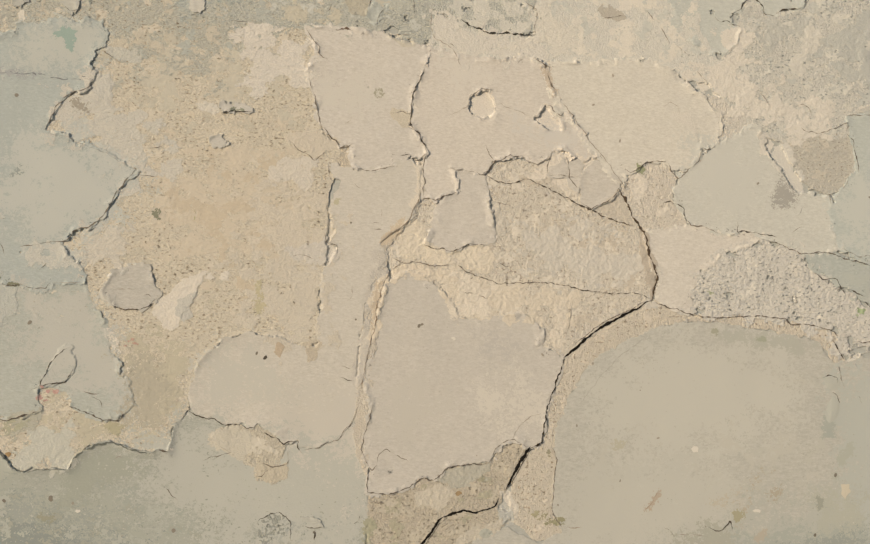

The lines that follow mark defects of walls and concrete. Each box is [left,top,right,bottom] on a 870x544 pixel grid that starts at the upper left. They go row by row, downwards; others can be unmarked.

crack [309,79,350,148]
peeling [0,0,733,473]
crack [341,59,659,533]
spalling [310,0,870,544]
crack [665,201,775,237]